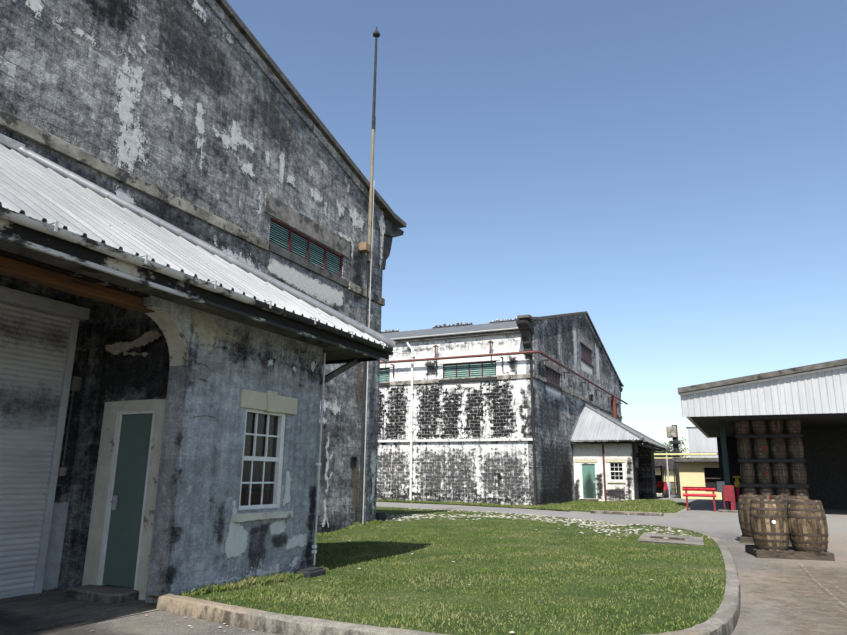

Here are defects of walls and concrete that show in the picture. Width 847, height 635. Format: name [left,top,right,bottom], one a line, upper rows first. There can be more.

peeling [13,0,45,24]
leakage [89,0,138,31]
peeling [191,0,208,22]
peeling [54,14,256,178]
peeling [265,148,296,187]
peeling [113,182,136,204]
peeling [307,185,365,259]
peeling [214,235,261,271]
leakage [376,318,611,509]
leakage [596,458,633,501]
peeling [224,499,308,568]